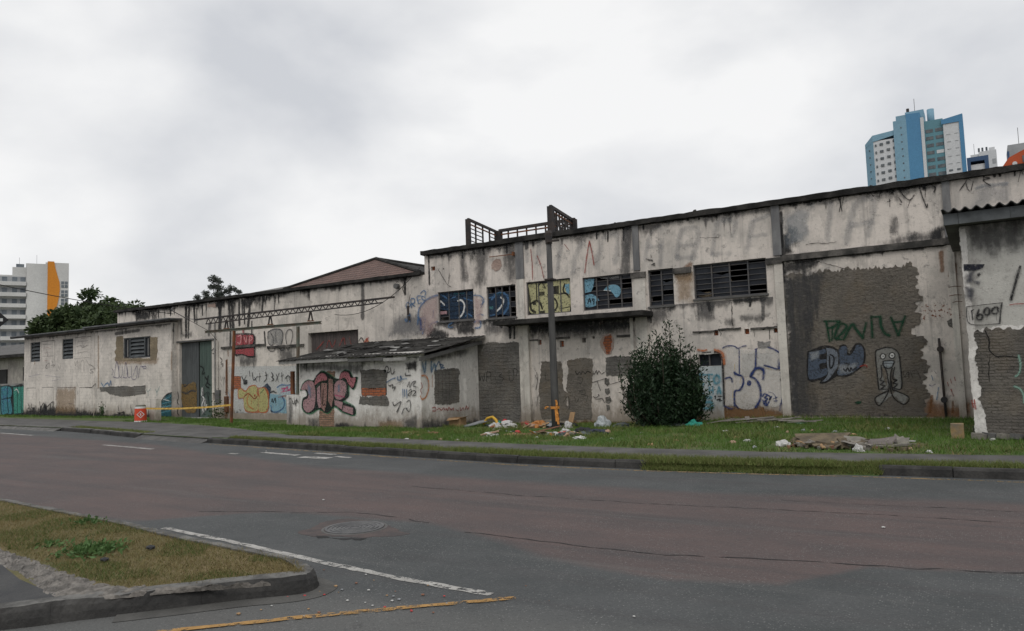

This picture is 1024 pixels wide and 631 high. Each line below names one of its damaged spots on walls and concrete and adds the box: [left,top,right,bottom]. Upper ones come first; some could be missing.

damp [22,182,950,417]